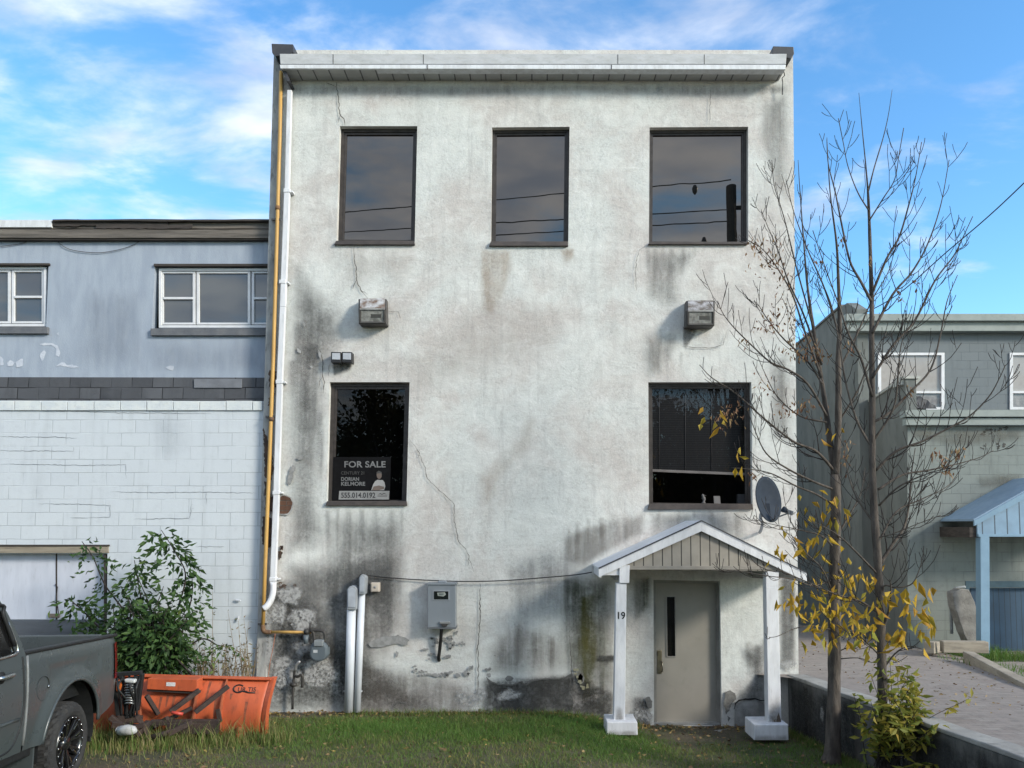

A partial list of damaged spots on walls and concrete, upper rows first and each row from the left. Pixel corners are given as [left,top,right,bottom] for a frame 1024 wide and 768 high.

peeling [40,332,78,368]
leakage [303,299,331,366]
peeling [266,582,339,688]
leakage [272,532,415,705]
peeling [368,635,409,657]
crack [412,443,481,707]
spalling [413,631,589,712]
leakage [485,584,614,718]